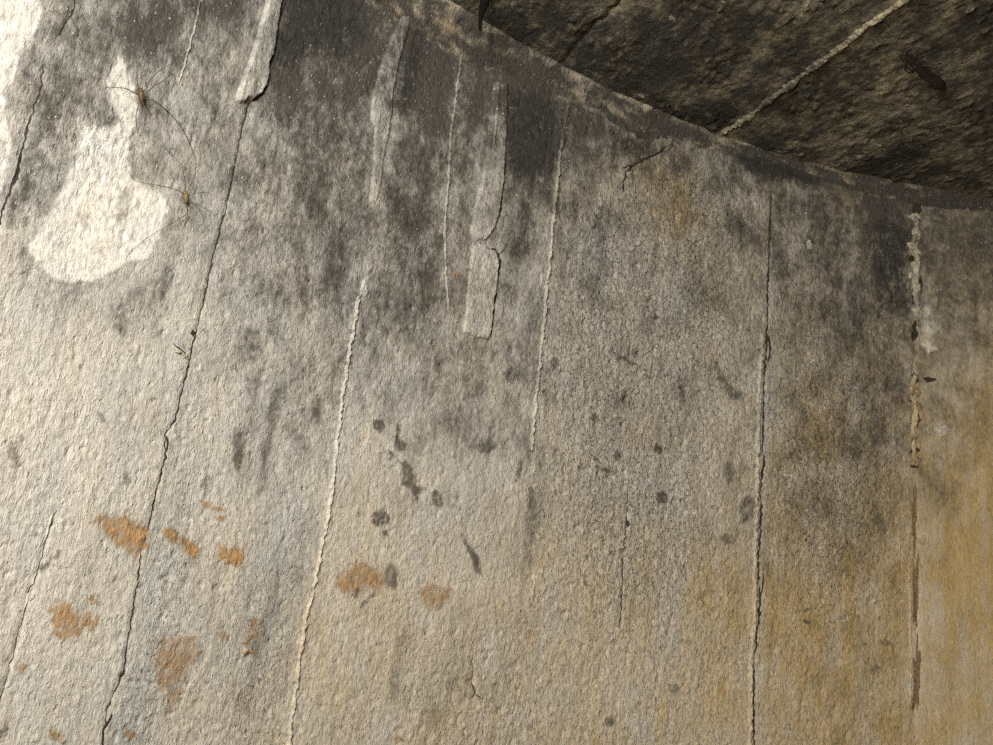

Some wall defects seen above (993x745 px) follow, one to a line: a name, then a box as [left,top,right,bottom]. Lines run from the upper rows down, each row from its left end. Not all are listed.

crack [0,64,44,225]
crack [101,4,286,745]
water stain [373,420,420,497]
crack [752,191,772,745]
corrosion [97,515,150,552]
corrosion [162,527,199,561]
corrosion [218,546,243,566]
corrosion [338,563,382,592]